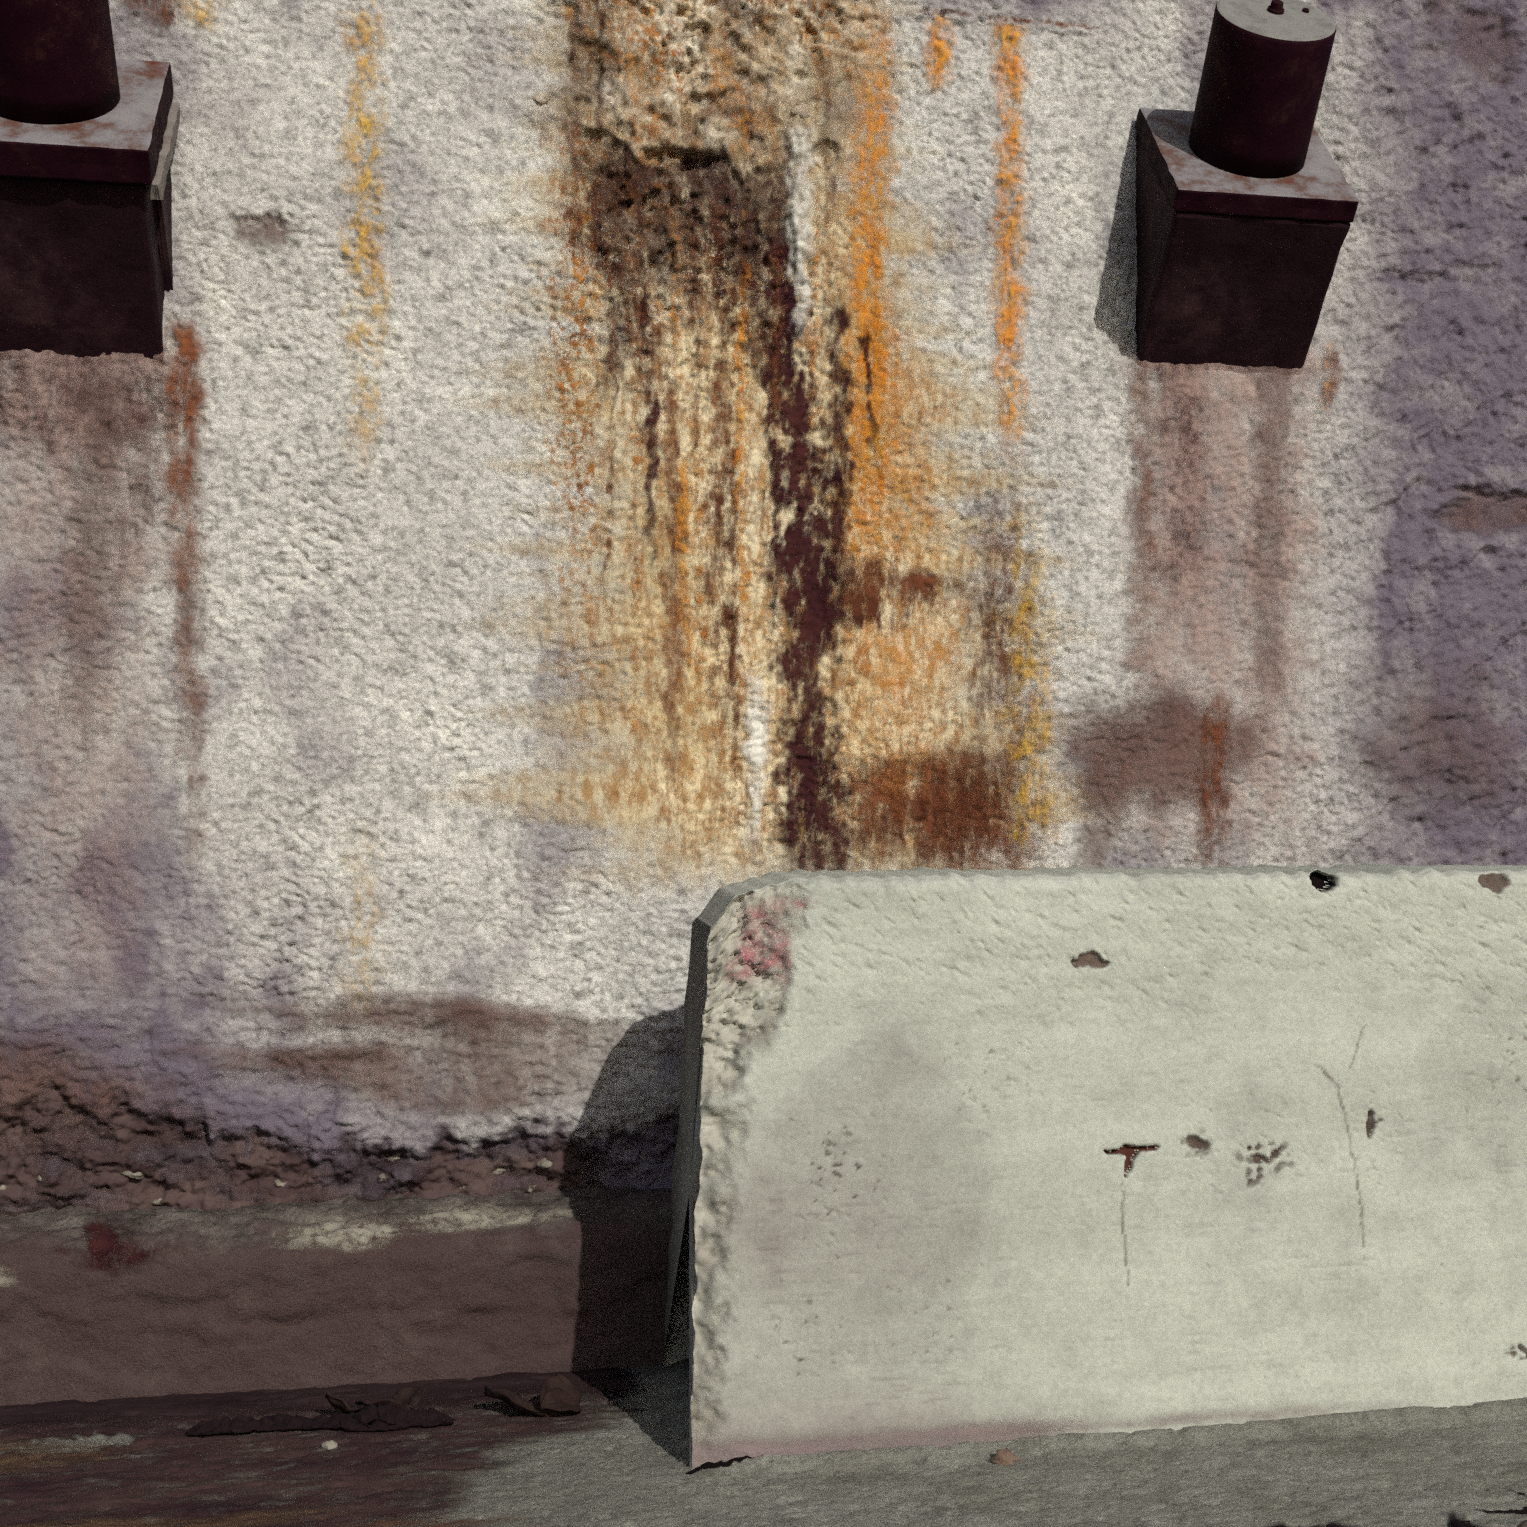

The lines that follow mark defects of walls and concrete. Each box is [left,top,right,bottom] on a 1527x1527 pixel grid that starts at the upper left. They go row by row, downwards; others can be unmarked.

rust [536,0,1058,872]
leakage [0,1045,134,1154]
leakage [269,1046,419,1098]
leakage [333,998,547,1109]
spalling [1450,1512,1478,1527]
crack [1481,1489,1527,1514]